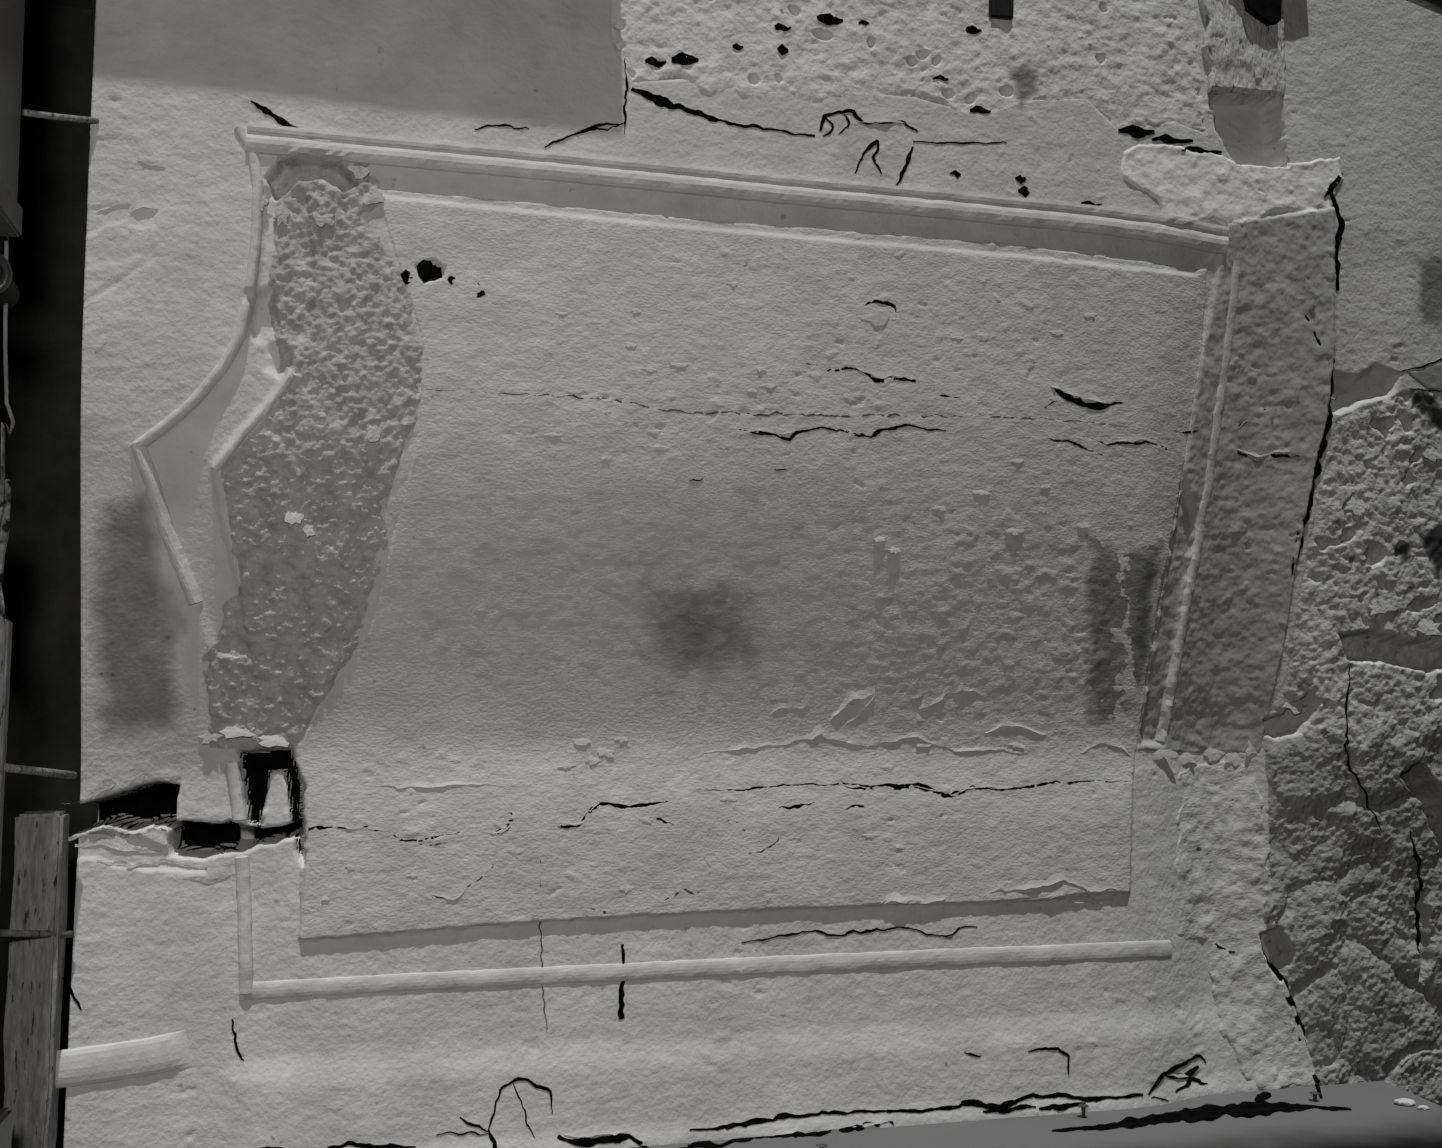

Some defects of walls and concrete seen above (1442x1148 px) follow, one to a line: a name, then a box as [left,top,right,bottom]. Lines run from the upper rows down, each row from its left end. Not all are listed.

crack [475,58,1007,186]
flaking render [611,0,1343,225]
crack [1324,173,1345,291]
crack [1402,358,1442,392]
crack [1237,314,1335,595]
flaking render [64,155,424,884]
flaking render [1152,385,1442,1090]
crack [741,926,977,943]
crack [327,1047,1208,1148]
flaking render [1394,1098,1430,1110]